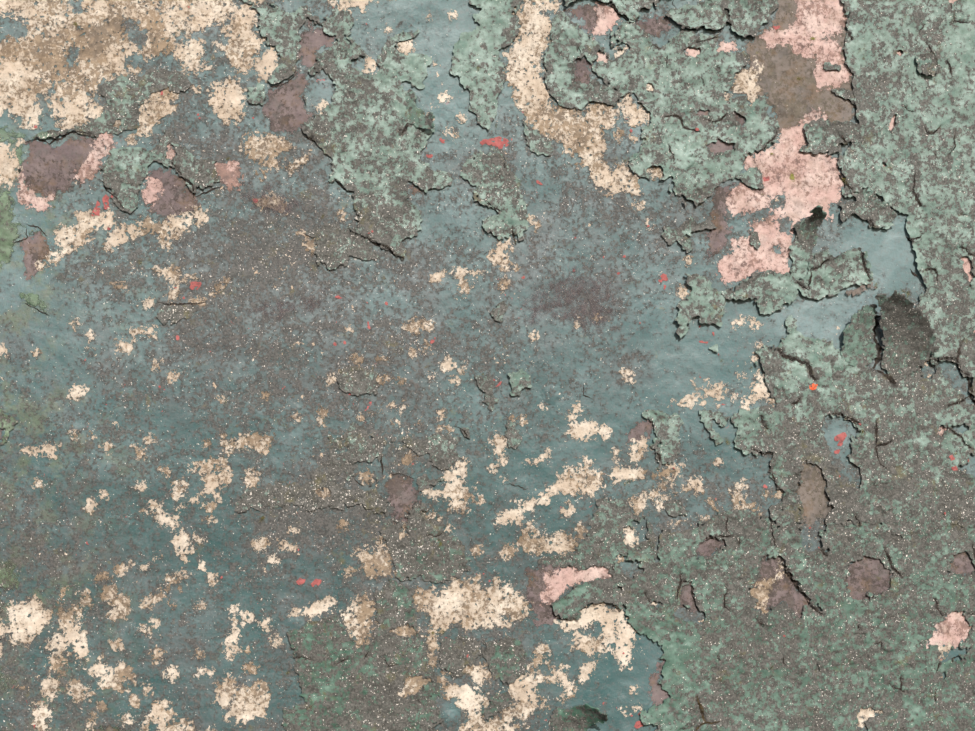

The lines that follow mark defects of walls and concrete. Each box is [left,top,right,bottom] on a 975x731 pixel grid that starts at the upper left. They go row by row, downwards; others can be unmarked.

peeling [0,0,453,281]
peeling [20,429,114,460]
peeling [210,0,975,731]
crack [778,349,817,381]
crack [833,412,891,467]
crack [872,315,896,384]
crack [935,344,975,448]
peeling [83,489,110,515]
peeling [136,429,275,639]
crack [771,525,823,614]
crack [884,549,903,578]
peeling [0,554,219,731]